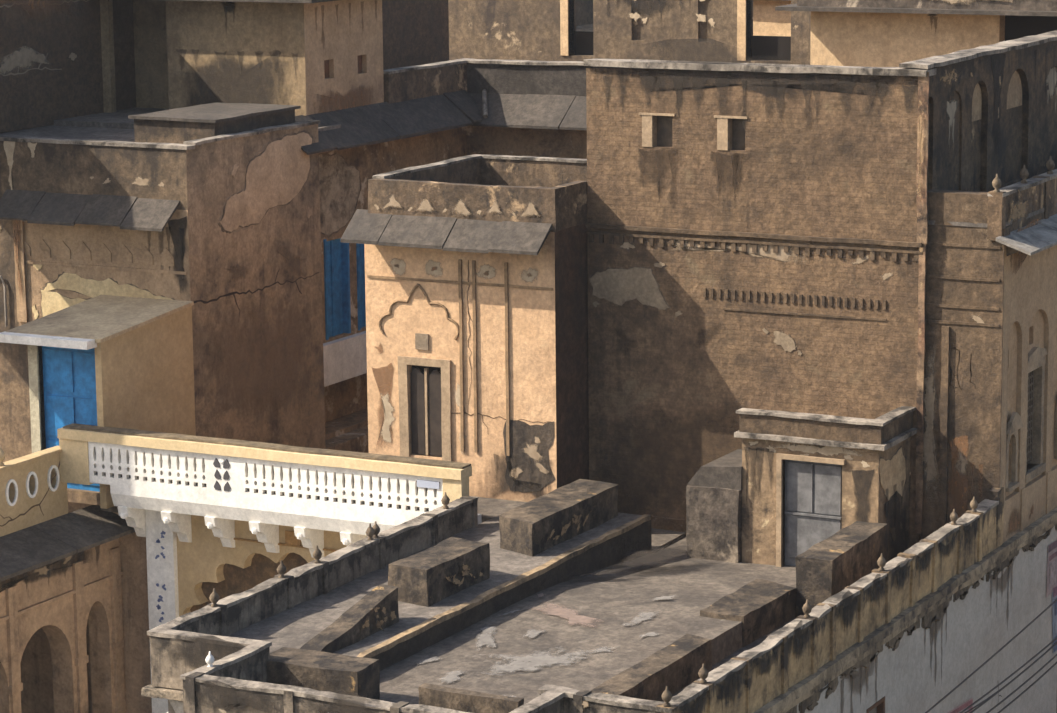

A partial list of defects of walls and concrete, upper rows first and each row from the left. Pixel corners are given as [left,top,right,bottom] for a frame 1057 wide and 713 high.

leakage [186,58,283,106]
peeling [218,130,368,238]
peeling [374,196,538,217]
peeling [32,272,175,320]
crack [194,269,319,316]
peeling [589,262,683,317]
peeling [503,420,555,493]
leakage [852,469,875,522]
leakage [895,518,979,588]
leakage [842,590,857,625]
flaking render [786,525,1057,713]
leakage [840,652,879,713]